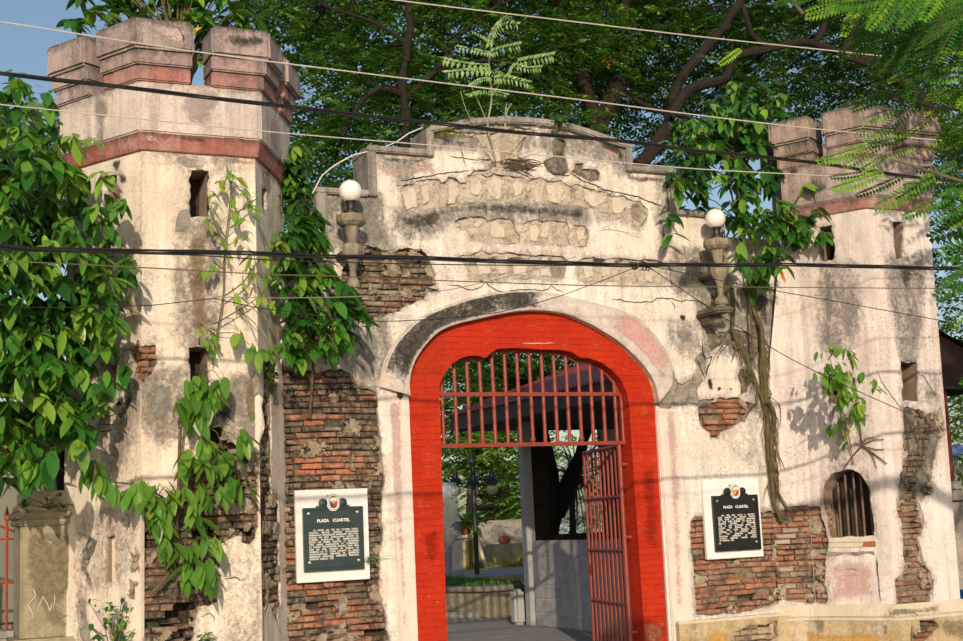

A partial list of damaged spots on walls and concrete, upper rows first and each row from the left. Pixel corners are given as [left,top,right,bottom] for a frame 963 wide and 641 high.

spalling [397,127,671,285]
spalling [328,245,438,323]
spalling [126,340,157,386]
spalling [637,325,760,438]
spalling [129,361,389,641]
spalling [690,499,875,616]
spalling [895,407,944,604]
spalling [730,623,776,641]